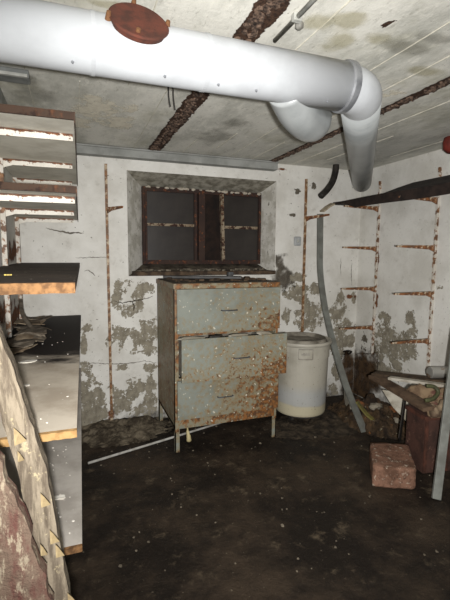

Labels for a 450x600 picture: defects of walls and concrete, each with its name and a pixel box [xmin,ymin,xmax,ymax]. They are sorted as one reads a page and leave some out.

peeling [80,278,158,426]
peeling [281,272,418,396]